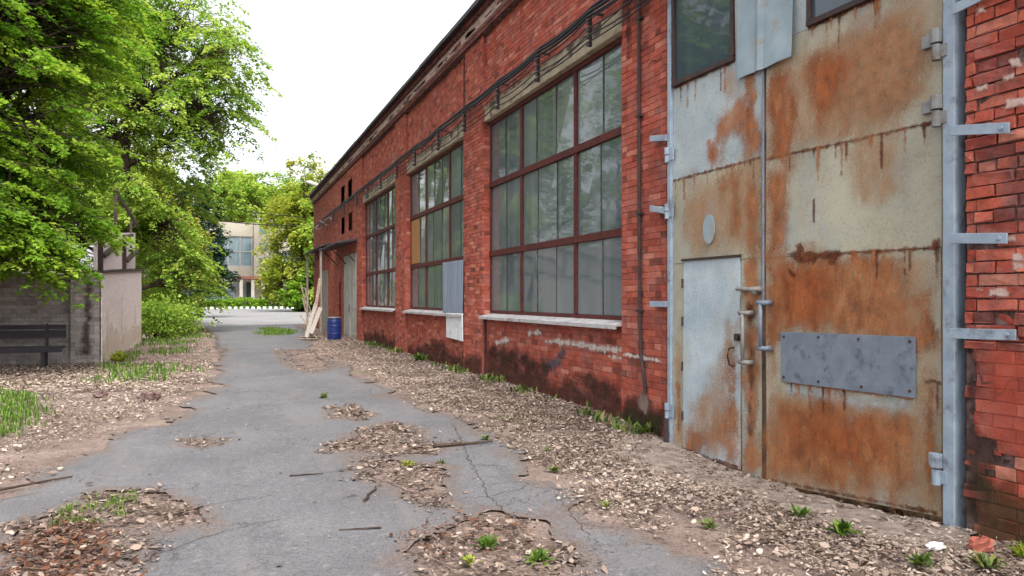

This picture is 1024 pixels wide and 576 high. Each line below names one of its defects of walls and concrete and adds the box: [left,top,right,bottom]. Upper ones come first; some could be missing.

corrosion [673,0,940,475]
water stain [407,337,664,424]
water stain [528,329,661,362]
corrosion [772,382,940,515]
crack [561,497,613,553]